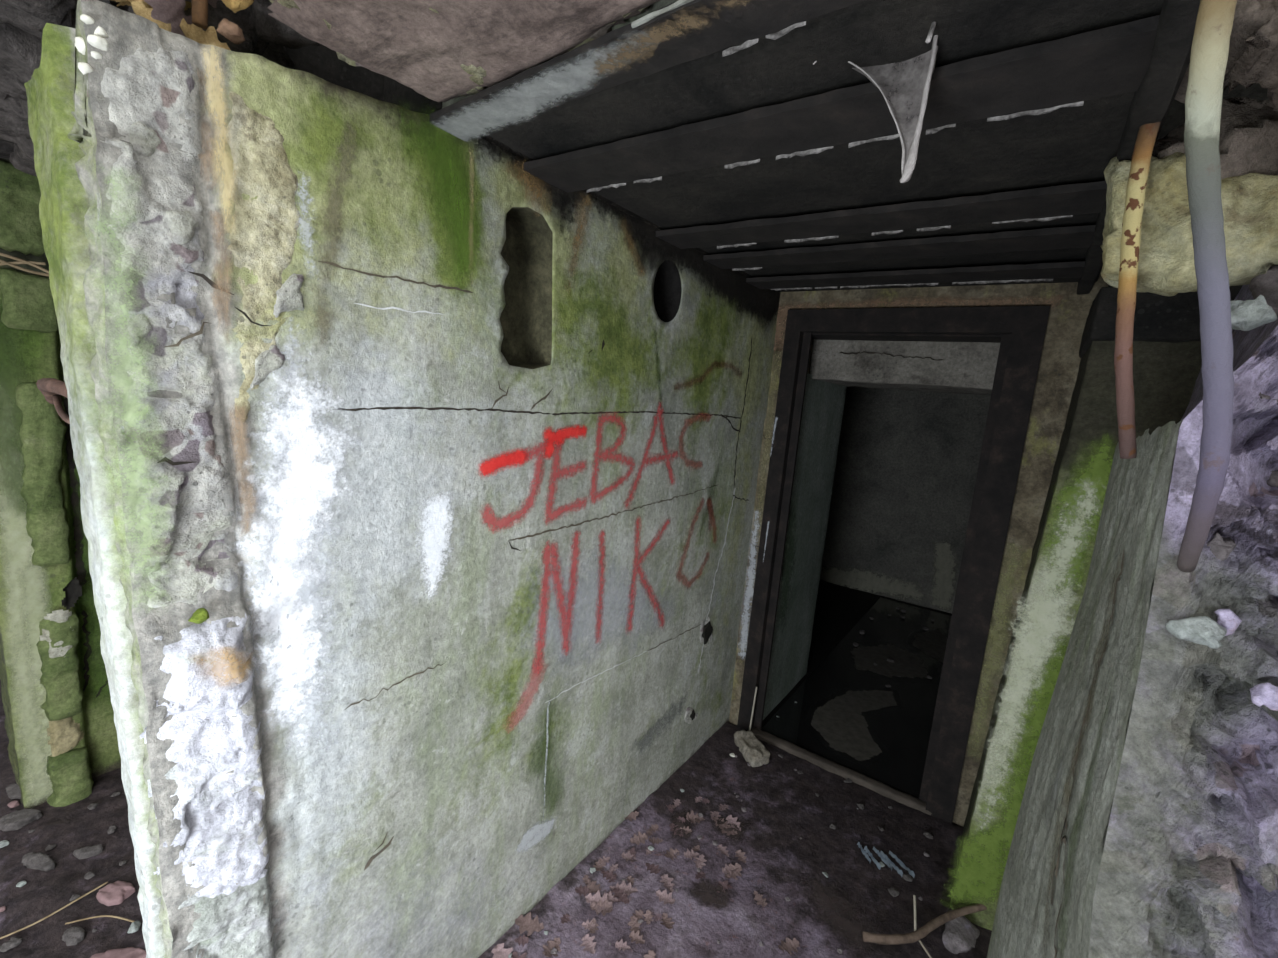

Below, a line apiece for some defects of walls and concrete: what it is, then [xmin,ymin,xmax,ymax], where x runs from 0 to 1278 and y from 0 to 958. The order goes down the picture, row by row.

spalling [87,45,238,608]
rust [199,48,236,324]
spalling [225,91,304,423]
crack [318,261,473,315]
water stain [410,32,662,276]
water stain [776,134,899,160]
water stain [987,101,1084,122]
spalling [140,613,285,958]
rust [230,406,256,533]
crack [364,832,394,870]
crack [332,339,771,703]
water stain [980,482,1104,828]